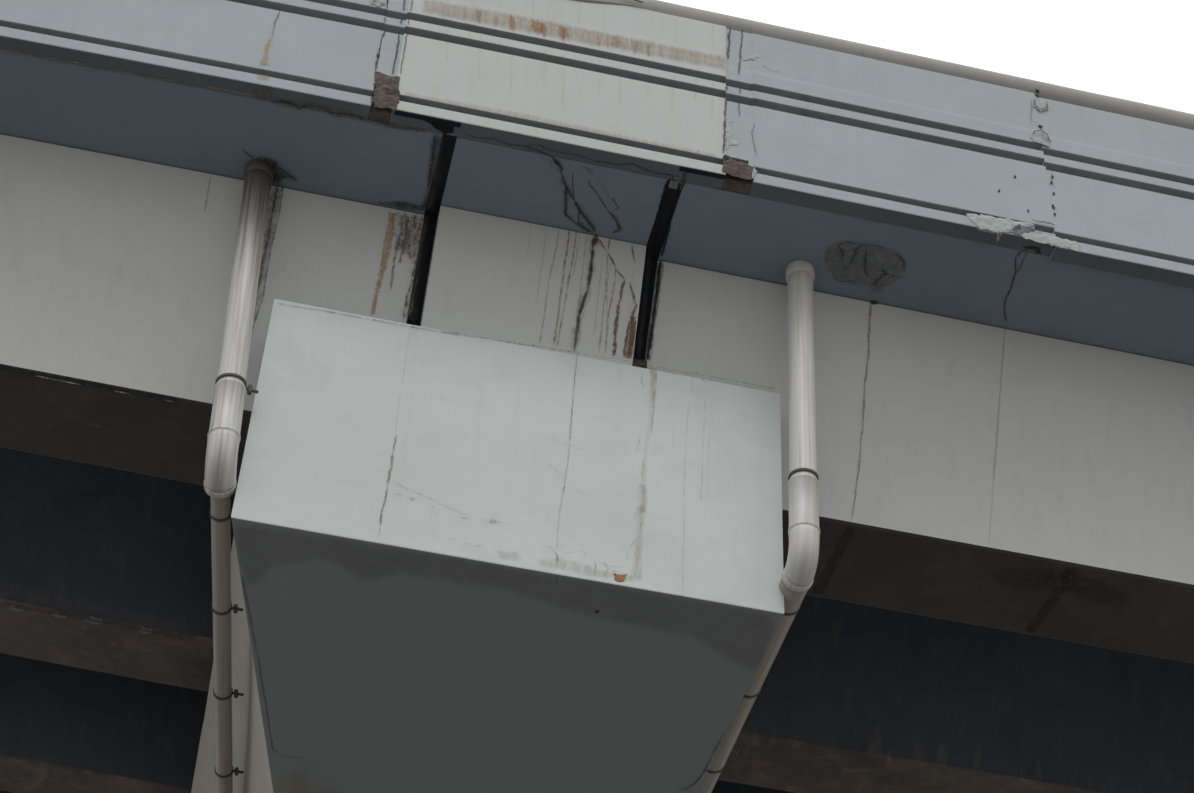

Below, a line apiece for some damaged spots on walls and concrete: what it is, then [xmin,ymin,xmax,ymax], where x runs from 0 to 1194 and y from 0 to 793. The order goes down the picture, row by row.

crack [375,0,413,73]
spalling [371,71,400,111]
spalling [1031,89,1051,147]
spalling [722,155,757,180]
crack [470,135,688,303]
peeling [966,175,1080,251]
corrosion [371,212,411,314]
crack [1004,246,1041,321]